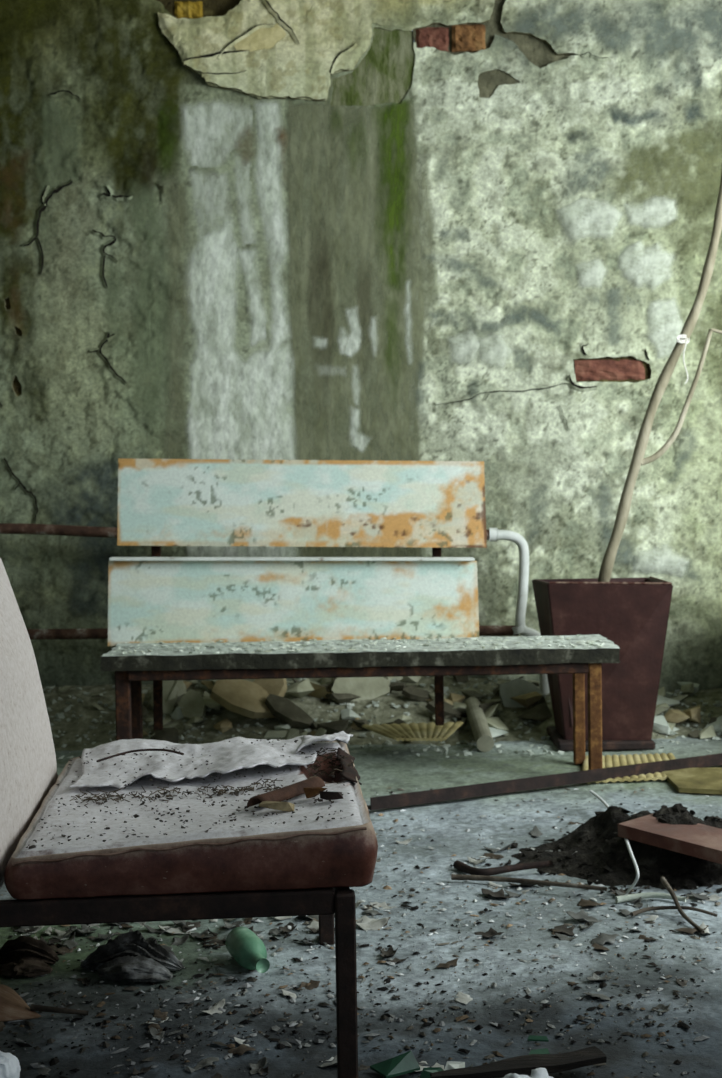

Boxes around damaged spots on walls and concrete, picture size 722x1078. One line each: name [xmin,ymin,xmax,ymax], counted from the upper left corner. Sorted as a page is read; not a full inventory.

peeling [157,0,579,107]
crack [100,185,133,201]
crack [22,179,73,275]
crack [92,230,117,289]
leakage [137,102,466,461]
leakage [469,309,560,331]
crack [89,332,127,385]
flaking render [573,356,651,383]
leakage [188,546,421,557]